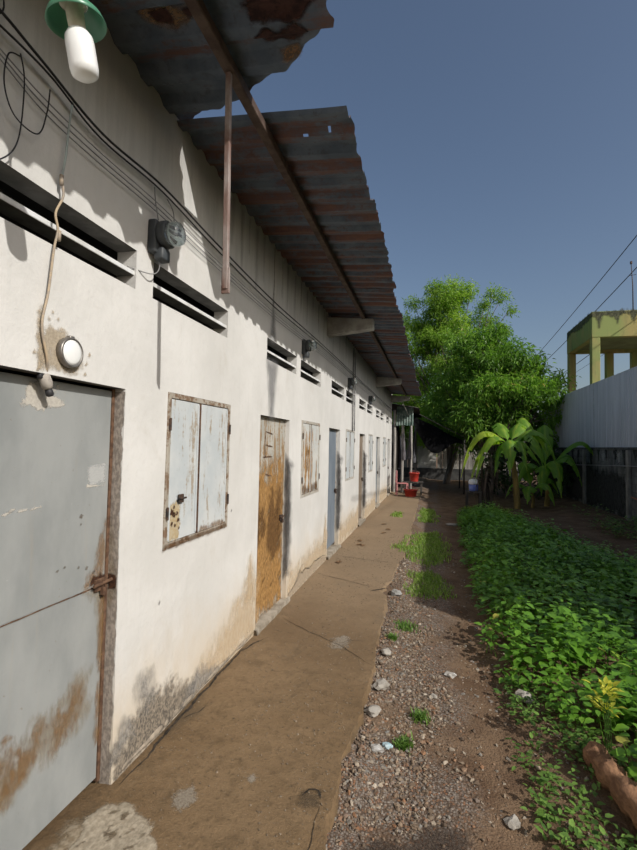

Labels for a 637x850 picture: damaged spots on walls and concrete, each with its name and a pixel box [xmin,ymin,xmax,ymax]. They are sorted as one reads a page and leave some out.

rust [138,5,192,29]
rust [240,0,311,62]
peeling [33,309,91,375]
rust [302,430,317,494]
rust [164,502,226,550]
rust [255,431,284,623]
leakage [111,669,215,781]
rust [0,728,42,806]